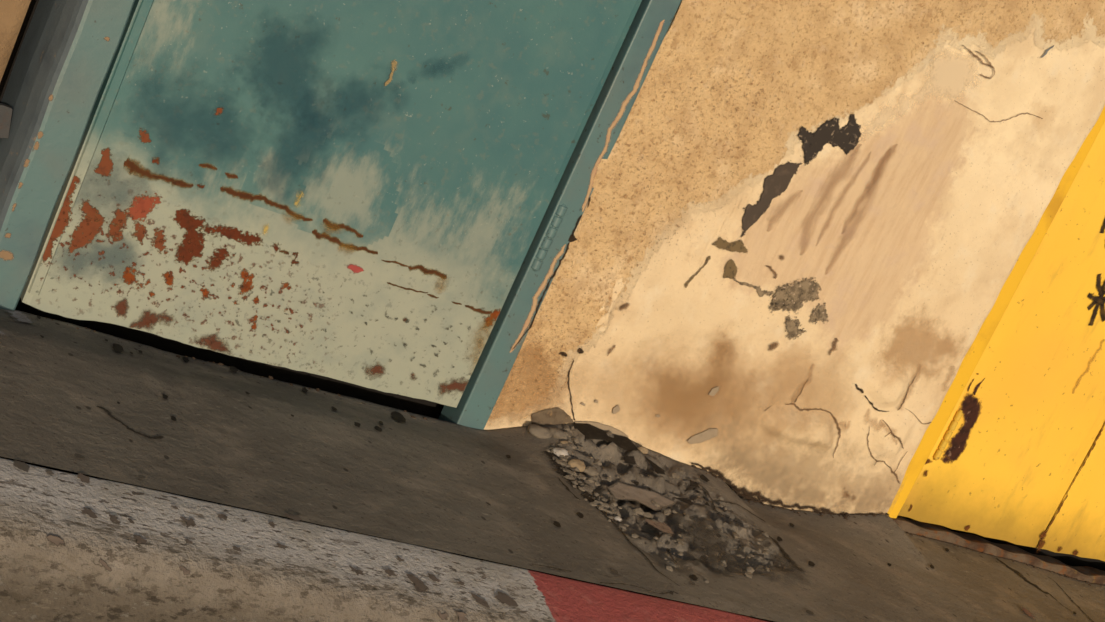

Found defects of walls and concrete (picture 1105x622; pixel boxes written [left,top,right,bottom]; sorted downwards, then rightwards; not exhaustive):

corrosion [137,128,152,143]
corrosion [40,148,317,355]
corrosion [199,163,447,279]
peeling [486,0,1105,534]
leakage [699,51,993,378]
corrosion [366,364,385,376]
corrosion [452,302,500,347]
crack [765,380,841,458]
crack [855,376,932,483]
crack [691,463,885,572]